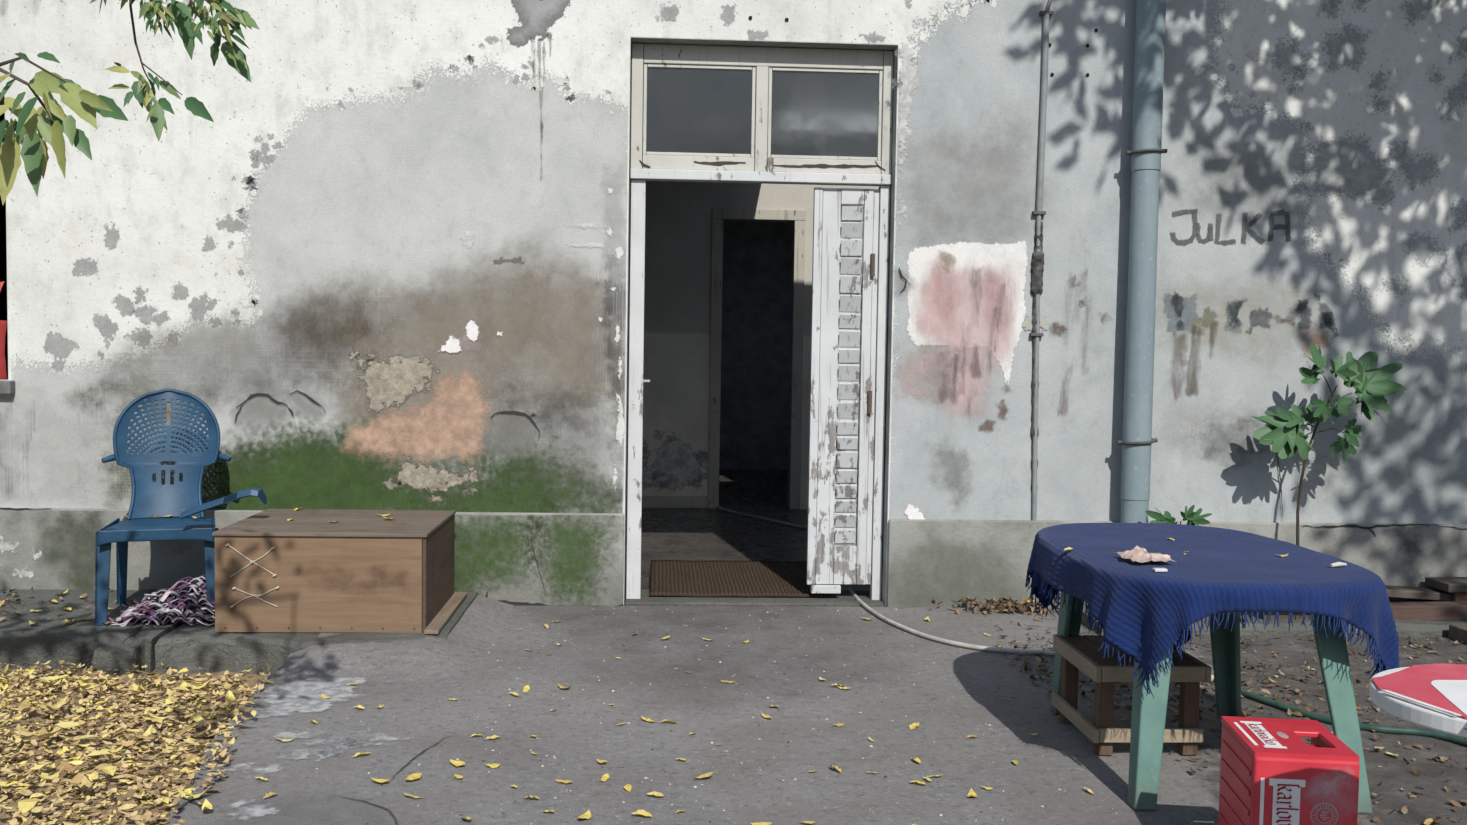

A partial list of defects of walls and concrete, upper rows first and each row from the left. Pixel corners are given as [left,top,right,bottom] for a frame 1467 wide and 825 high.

crack [234,390,326,423]
peeling [0,0,656,513]
leakage [289,270,619,436]
peeling [655,4,681,21]
peeling [859,0,1137,521]
peeling [1148,0,1467,524]